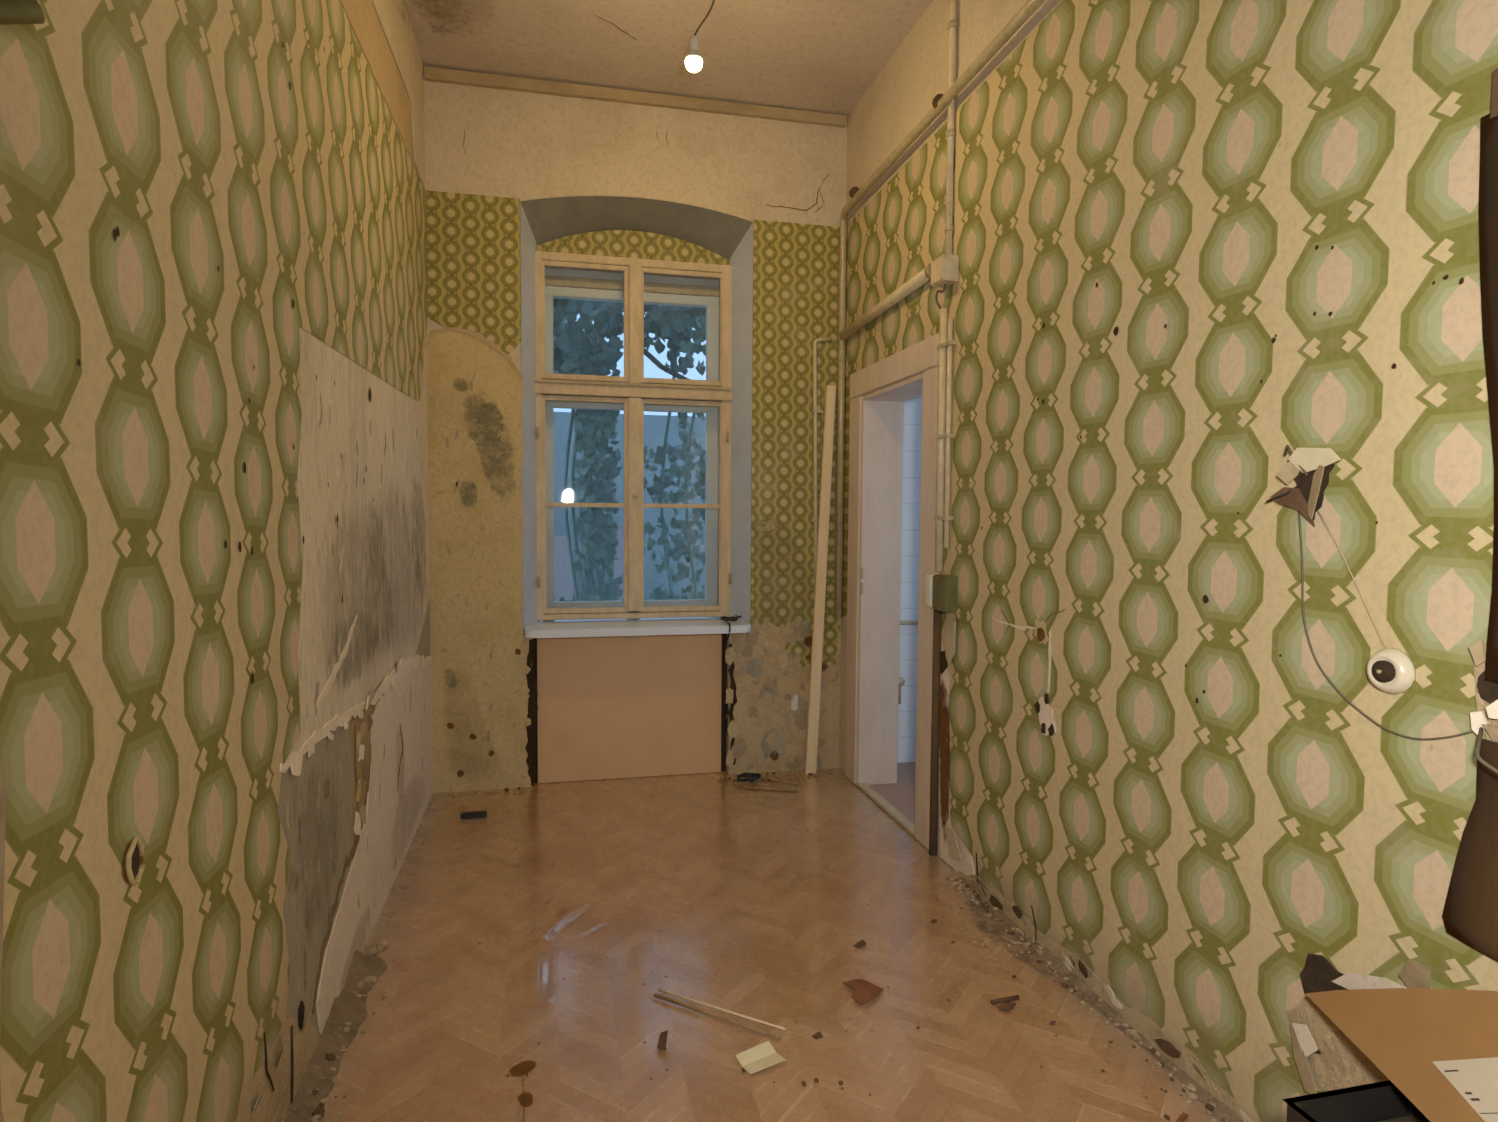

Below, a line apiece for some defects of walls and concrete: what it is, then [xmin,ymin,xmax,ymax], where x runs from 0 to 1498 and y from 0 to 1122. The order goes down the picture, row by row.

flaking render [238,327,538,1122]
flaking render [725,617,841,775]
spalling [131,846,139,876]